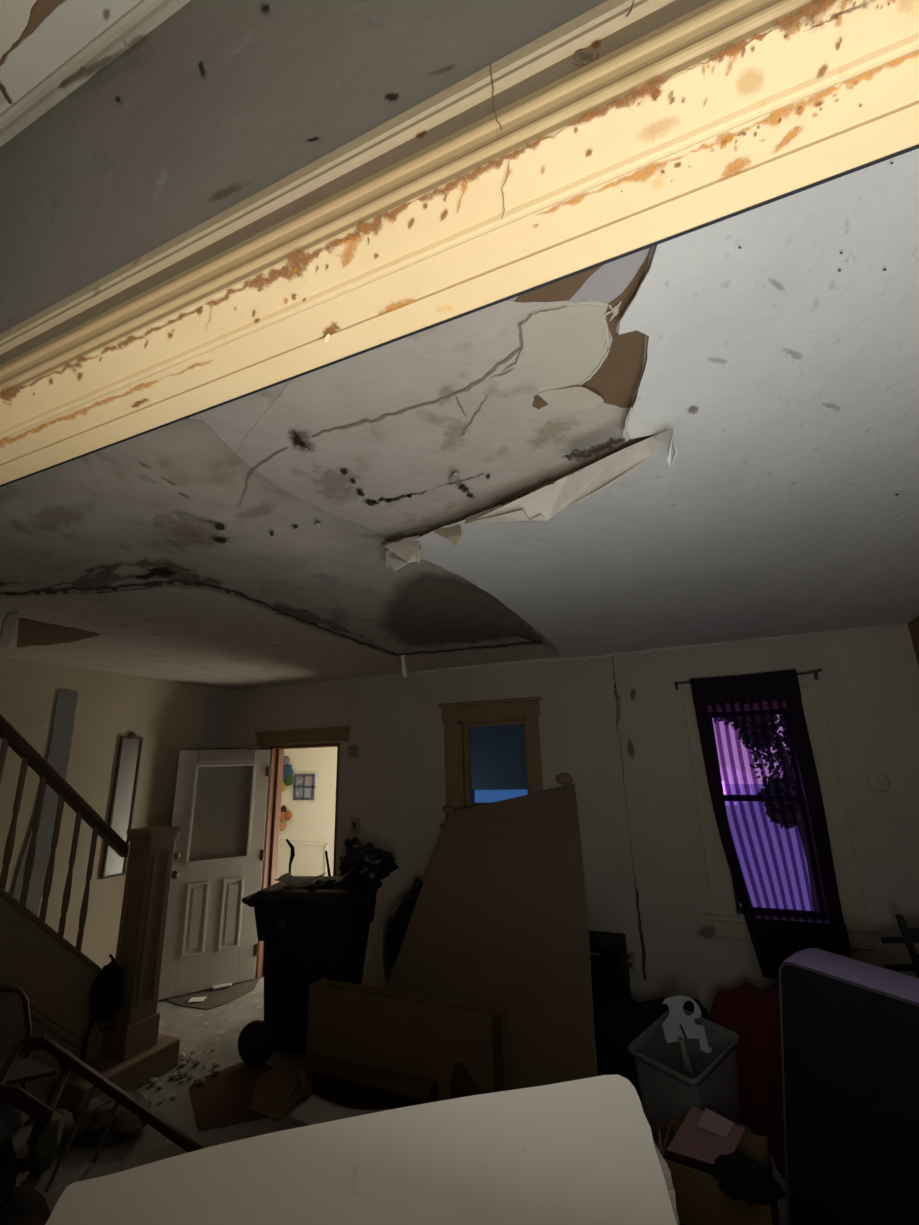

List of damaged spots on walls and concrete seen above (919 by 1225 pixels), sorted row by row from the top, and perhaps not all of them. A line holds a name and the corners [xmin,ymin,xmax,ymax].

corrosion [0,0,919,402]
corrosion [0,363,204,446]
leakage [211,524,230,544]
crack [239,306,566,507]
leakage [341,469,491,506]
peeling [235,245,656,522]
leakage [381,438,625,545]
crack [612,656,647,979]